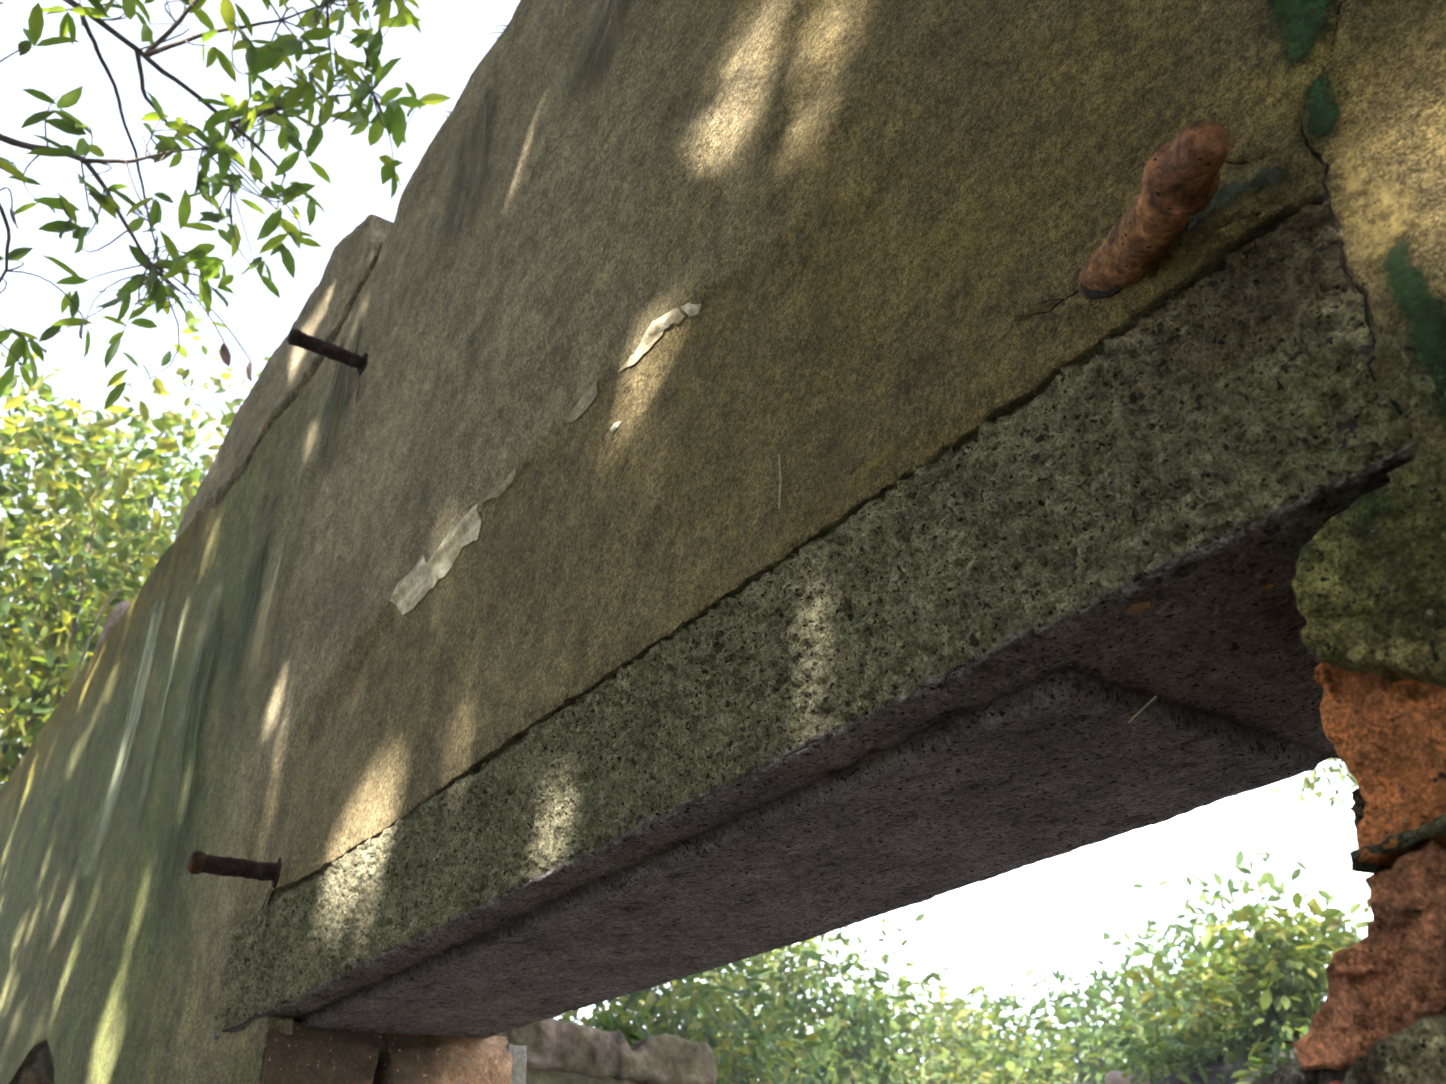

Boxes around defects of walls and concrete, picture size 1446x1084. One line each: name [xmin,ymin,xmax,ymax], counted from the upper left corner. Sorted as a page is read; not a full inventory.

crack [1300,105,1404,416]
flaking render [618,303,702,372]
flaking render [562,380,599,422]
flaking render [390,467,517,616]
spalling [18,1045,54,1084]